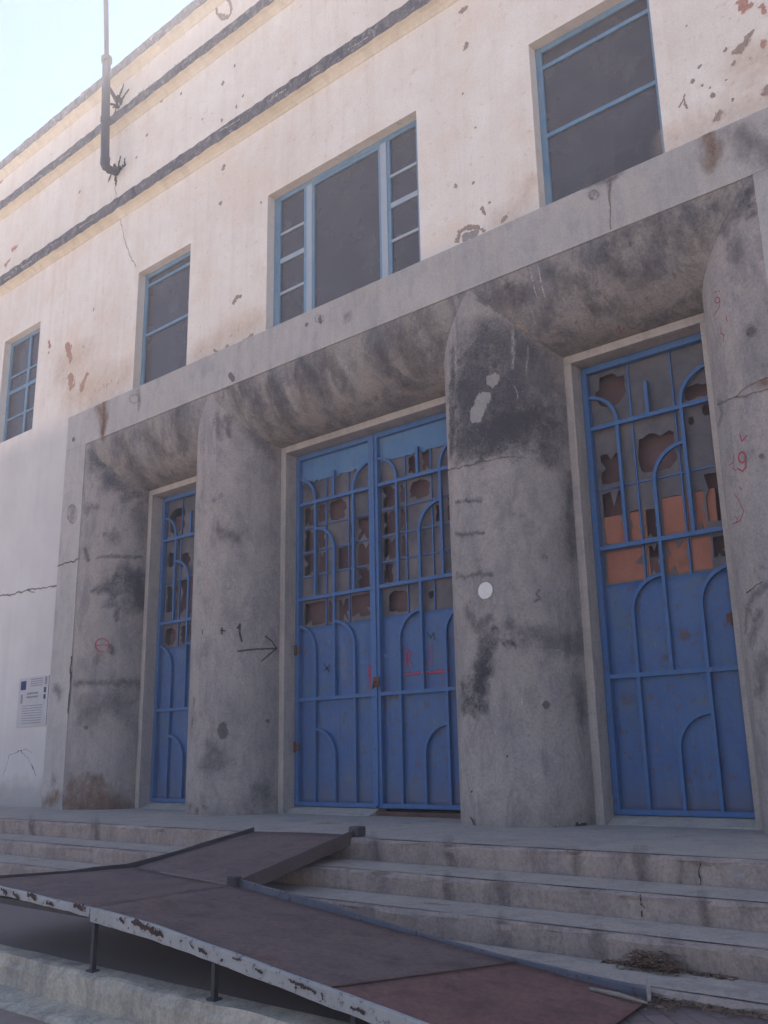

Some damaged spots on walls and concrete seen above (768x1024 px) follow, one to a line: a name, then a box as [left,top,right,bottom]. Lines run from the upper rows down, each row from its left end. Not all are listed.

peeling [736,0,767,14]
peeling [723,29,767,66]
flaking render [454,201,491,243]
peeling [65,342,89,392]
crack [717,377,768,405]
crack [0,558,78,596]
damp [463,628,526,714]